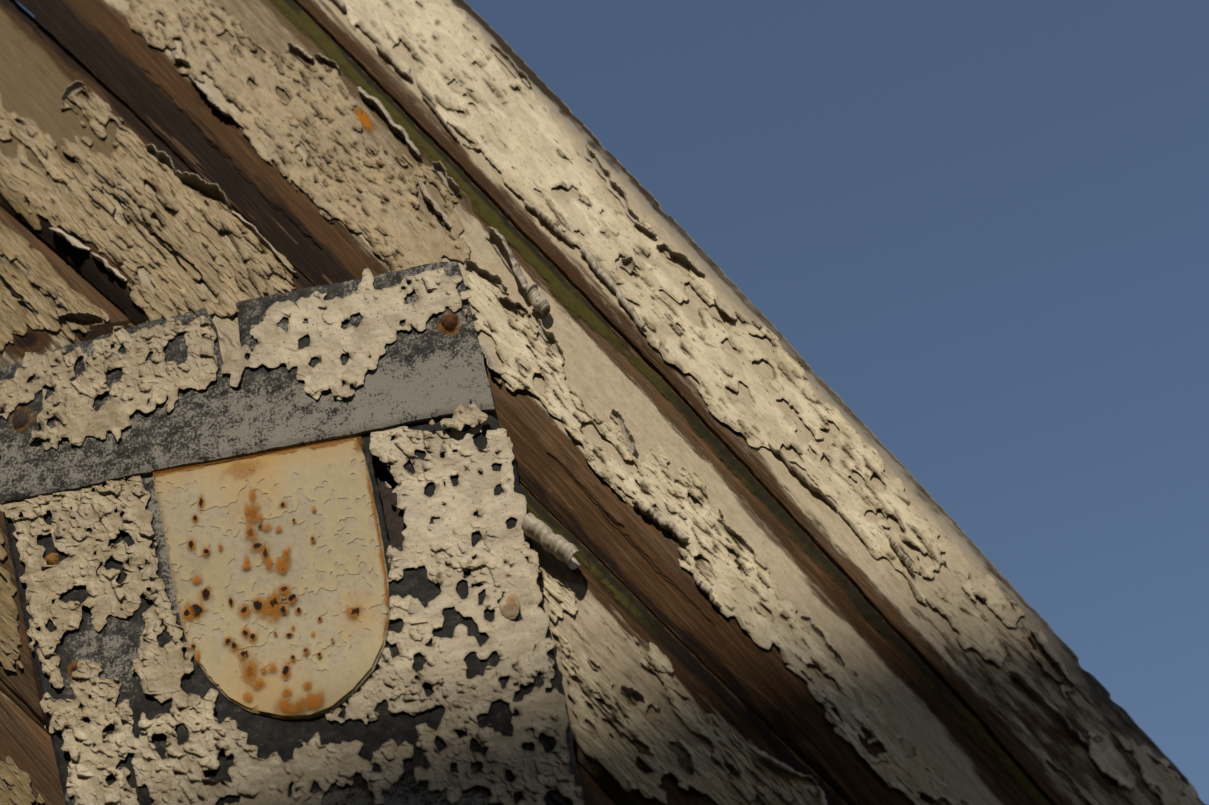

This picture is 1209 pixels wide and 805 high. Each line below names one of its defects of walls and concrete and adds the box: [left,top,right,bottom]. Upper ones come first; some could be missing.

peeling [0,80,298,451]
rust [183,575,210,618]
rust [187,539,222,556]
rust [153,436,366,475]
rust [224,490,323,713]
rust [368,479,388,642]
peeling [0,396,827,805]
peeling [334,0,1203,805]